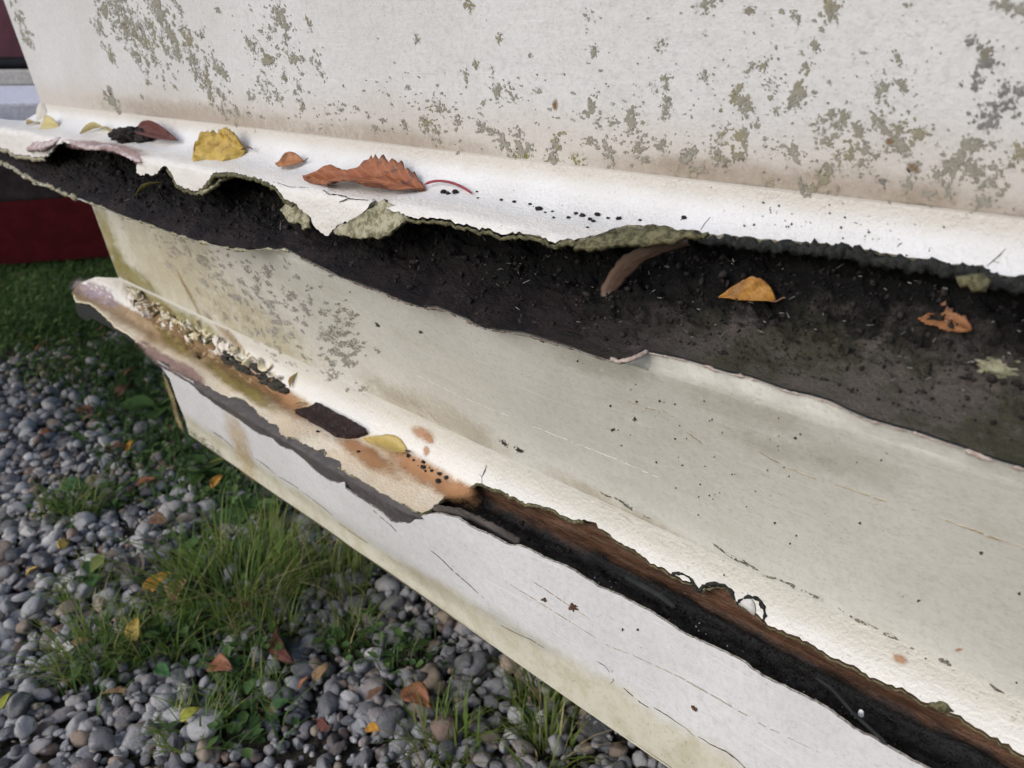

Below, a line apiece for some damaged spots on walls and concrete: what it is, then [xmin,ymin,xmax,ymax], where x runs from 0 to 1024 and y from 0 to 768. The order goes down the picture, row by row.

spalling [90,0,1024,297]
leakage [114,252,303,417]
rust [413,428,433,455]
peeling [0,137,1024,471]
spalling [469,483,585,525]
spalling [599,530,1024,760]